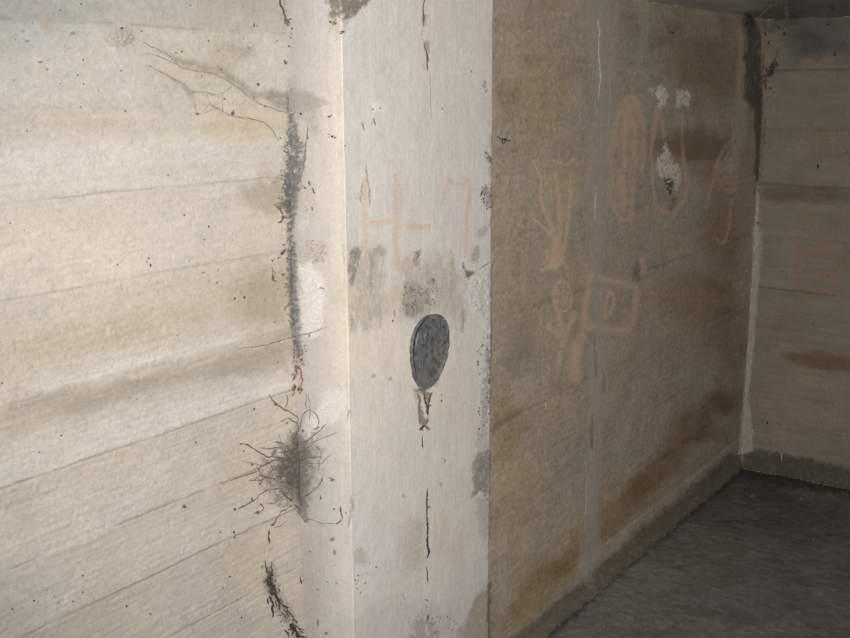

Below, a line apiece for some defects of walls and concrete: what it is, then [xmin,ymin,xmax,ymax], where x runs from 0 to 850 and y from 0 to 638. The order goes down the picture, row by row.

crack [421,0,432,118]
water stain [191,80,327,379]
rust [289,345,306,396]
water stain [514,0,850,638]
crack [264,530,307,638]
crack [410,489,431,621]